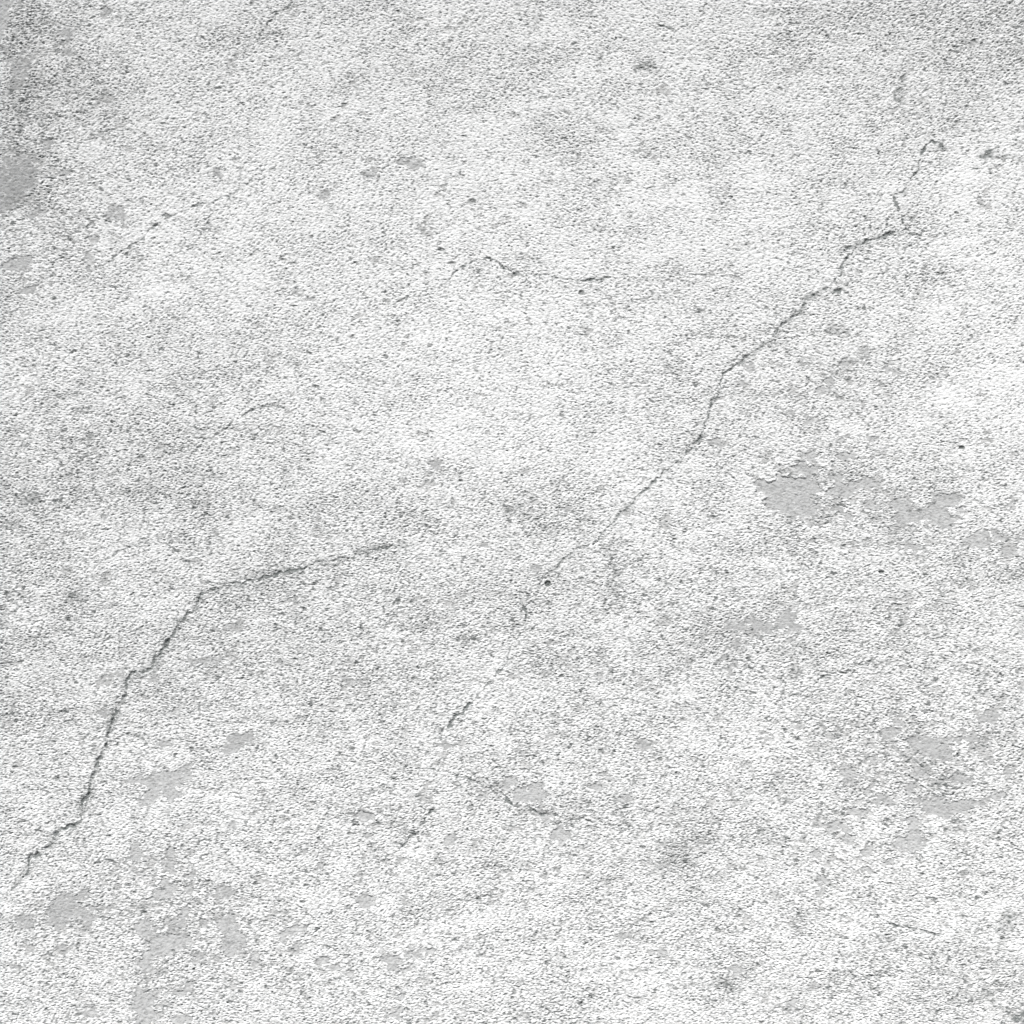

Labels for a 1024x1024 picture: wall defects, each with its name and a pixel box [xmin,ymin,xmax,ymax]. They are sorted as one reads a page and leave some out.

crack [462,257,542,283]
crack [777,141,943,332]
crack [598,362,743,537]
peeling [751,450,965,530]
crack [11,546,303,890]
crack [447,669,502,728]